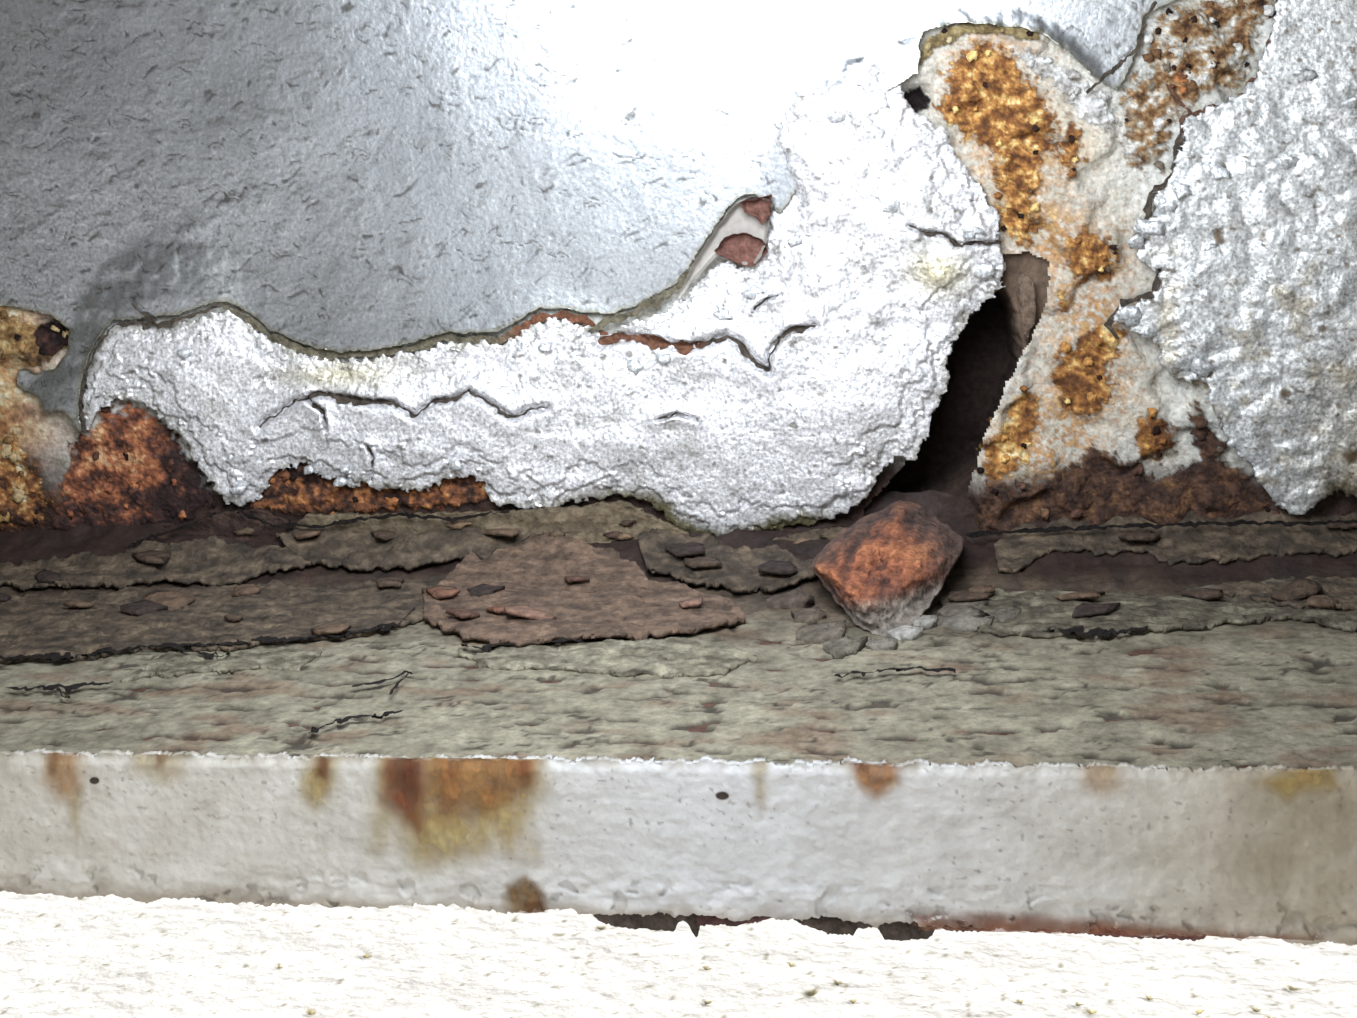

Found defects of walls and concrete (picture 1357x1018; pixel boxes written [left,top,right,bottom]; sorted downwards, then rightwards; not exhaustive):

rust [919,23,1088,249]
rust [0,310,70,367]
spalling [33,321,68,356]
crack [78,269,816,433]
peeling [81,63,1006,568]
crack [909,225,1002,247]
rust [1055,225,1120,312]
rust [1049,322,1127,416]
rust [0,401,509,548]
rust [966,385,1357,538]
rust [386,757,533,856]
rust [507,878,544,913]